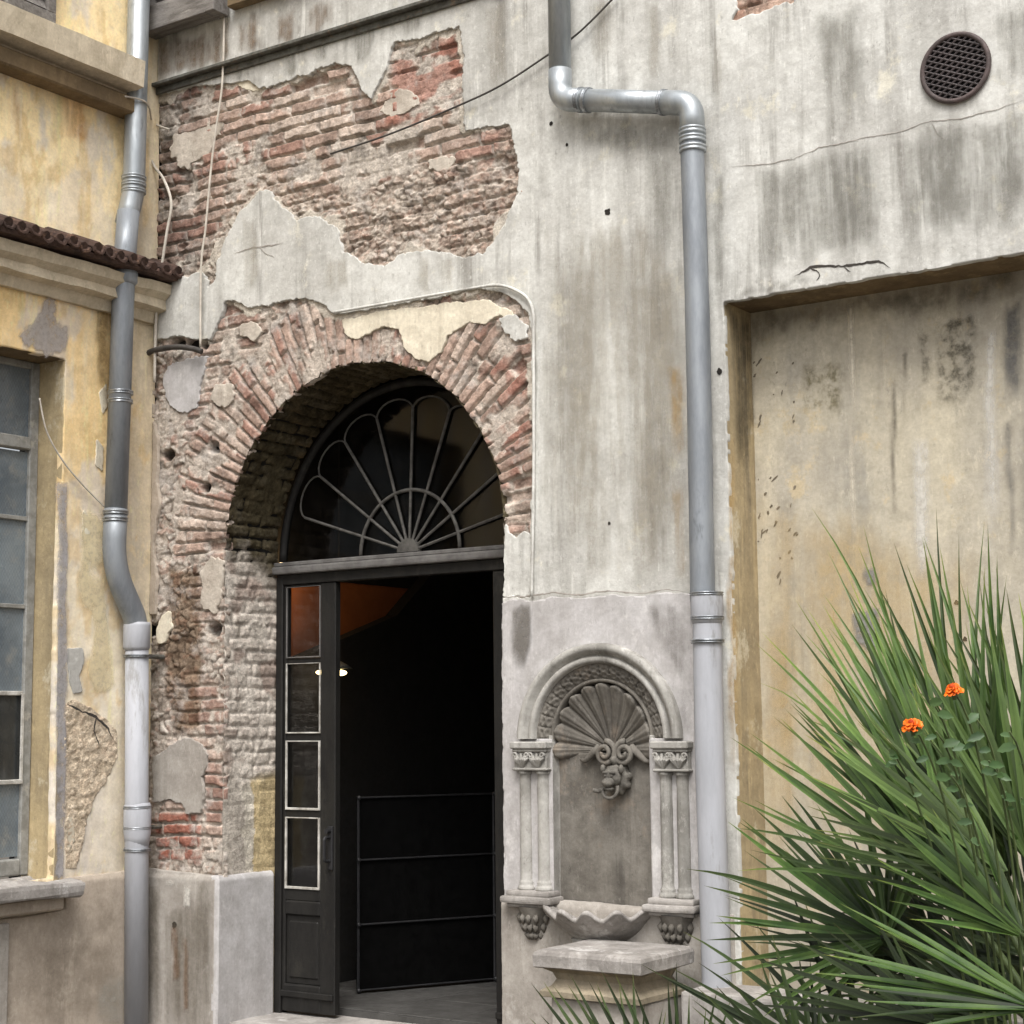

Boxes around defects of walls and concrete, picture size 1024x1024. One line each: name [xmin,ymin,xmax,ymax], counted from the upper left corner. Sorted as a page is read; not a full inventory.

flaking render [157,28,522,285]
crack [733,101,1021,167]
crack [235,243,281,257]
crack [795,260,890,280]
damp [943,318,972,388]
peeling [95,440,104,471]
flaking render [149,289,532,877]
flaking render [55,483,118,878]